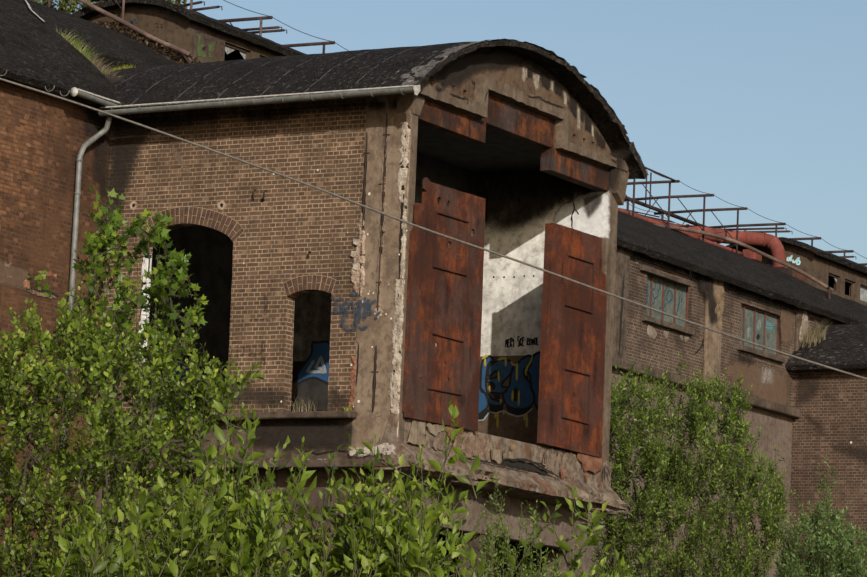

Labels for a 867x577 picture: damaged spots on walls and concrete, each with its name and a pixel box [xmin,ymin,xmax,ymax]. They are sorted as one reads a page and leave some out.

spalling [348,113,610,482]